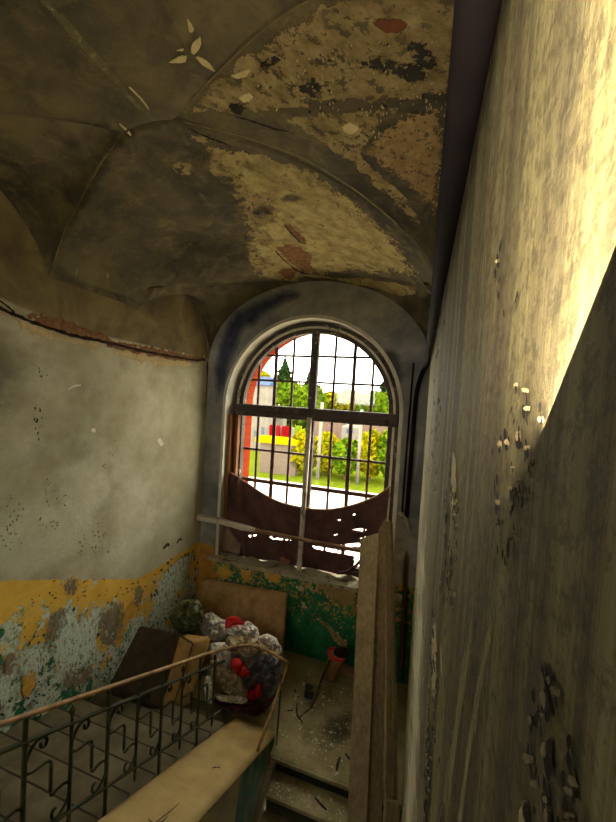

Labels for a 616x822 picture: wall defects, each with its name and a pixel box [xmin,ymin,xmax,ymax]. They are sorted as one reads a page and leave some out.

peeling [169,0,454,296]
peeling [0,550,199,716]
peeling [216,564,316,608]
peeling [316,603,357,648]
water stain [402,511,427,822]
peeling [423,453,459,822]
water stain [442,624,473,822]
water stain [458,617,493,822]